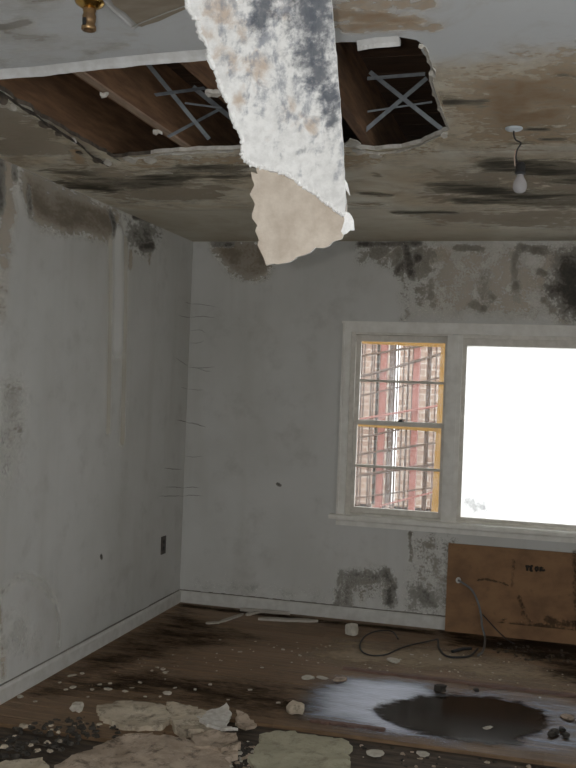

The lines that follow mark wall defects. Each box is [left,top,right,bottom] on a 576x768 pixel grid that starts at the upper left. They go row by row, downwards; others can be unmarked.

leakage [442,49,576,148]
leakage [392,156,576,228]
leakage [0,108,253,356]
leakage [211,242,270,281]
leakage [356,241,484,308]
leakage [463,243,576,321]
leakage [335,568,398,609]
leakage [408,531,454,610]